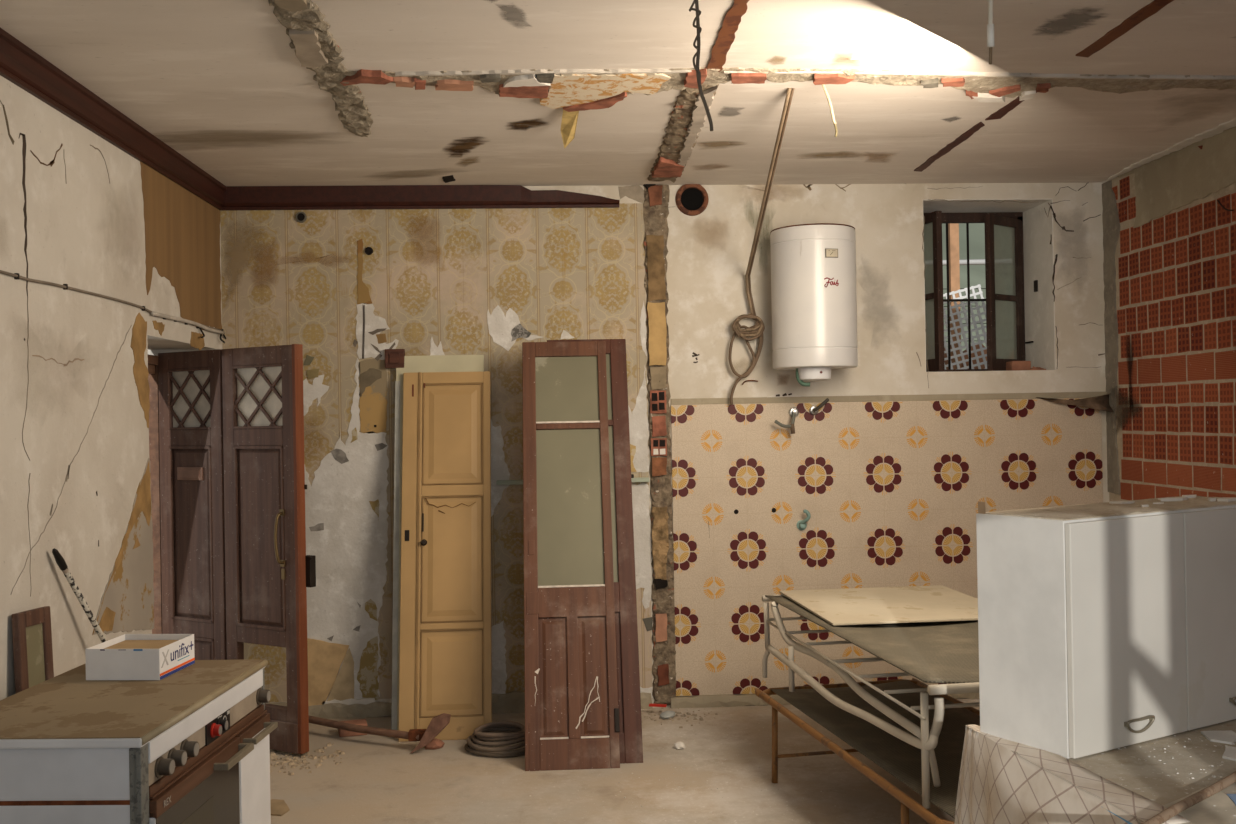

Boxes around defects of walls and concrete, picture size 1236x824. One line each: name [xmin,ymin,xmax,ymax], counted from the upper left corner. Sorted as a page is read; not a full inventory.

spalling [503,74,551,87]
spalling [973,91,1036,103]
crack [0,101,132,597]
spalling [331,449,349,464]